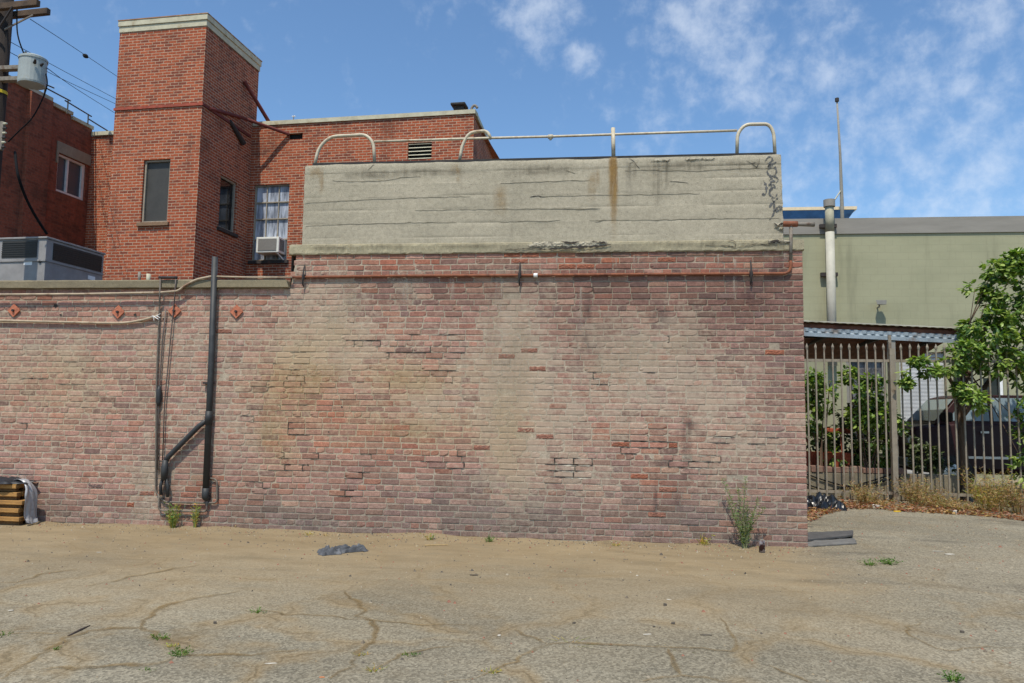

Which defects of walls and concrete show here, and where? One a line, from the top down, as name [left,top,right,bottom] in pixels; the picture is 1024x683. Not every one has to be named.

crack [312,164,605,226]
crack [625,159,760,195]
spalling [503,241,610,263]